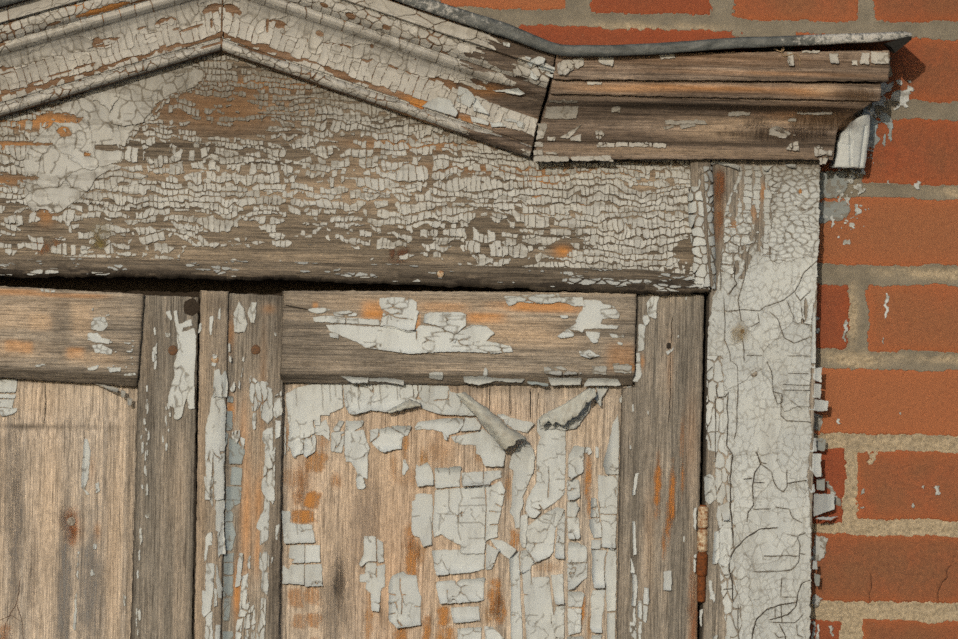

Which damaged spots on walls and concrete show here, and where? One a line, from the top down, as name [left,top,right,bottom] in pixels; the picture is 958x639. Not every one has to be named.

peeling [851,51,890,66]
peeling [0,0,716,291]
peeling [87,308,136,376]
peeling [152,308,221,451]
peeling [233,302,257,333]
peeling [308,297,513,354]
peeling [504,286,624,358]
peeling [612,296,659,388]
peeling [704,145,838,639]
peeling [202,343,631,639]
crack [707,265,811,639]
peeling [630,521,649,639]